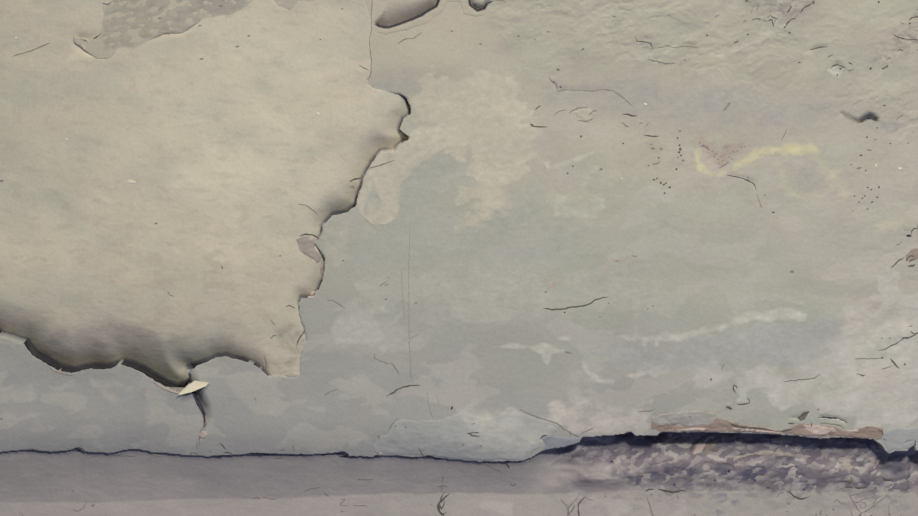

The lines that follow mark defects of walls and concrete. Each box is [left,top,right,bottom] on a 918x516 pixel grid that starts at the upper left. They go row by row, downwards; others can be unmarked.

peeling [0,0,411,395]
spalling [891,248,918,268]
crack [2,391,379,459]